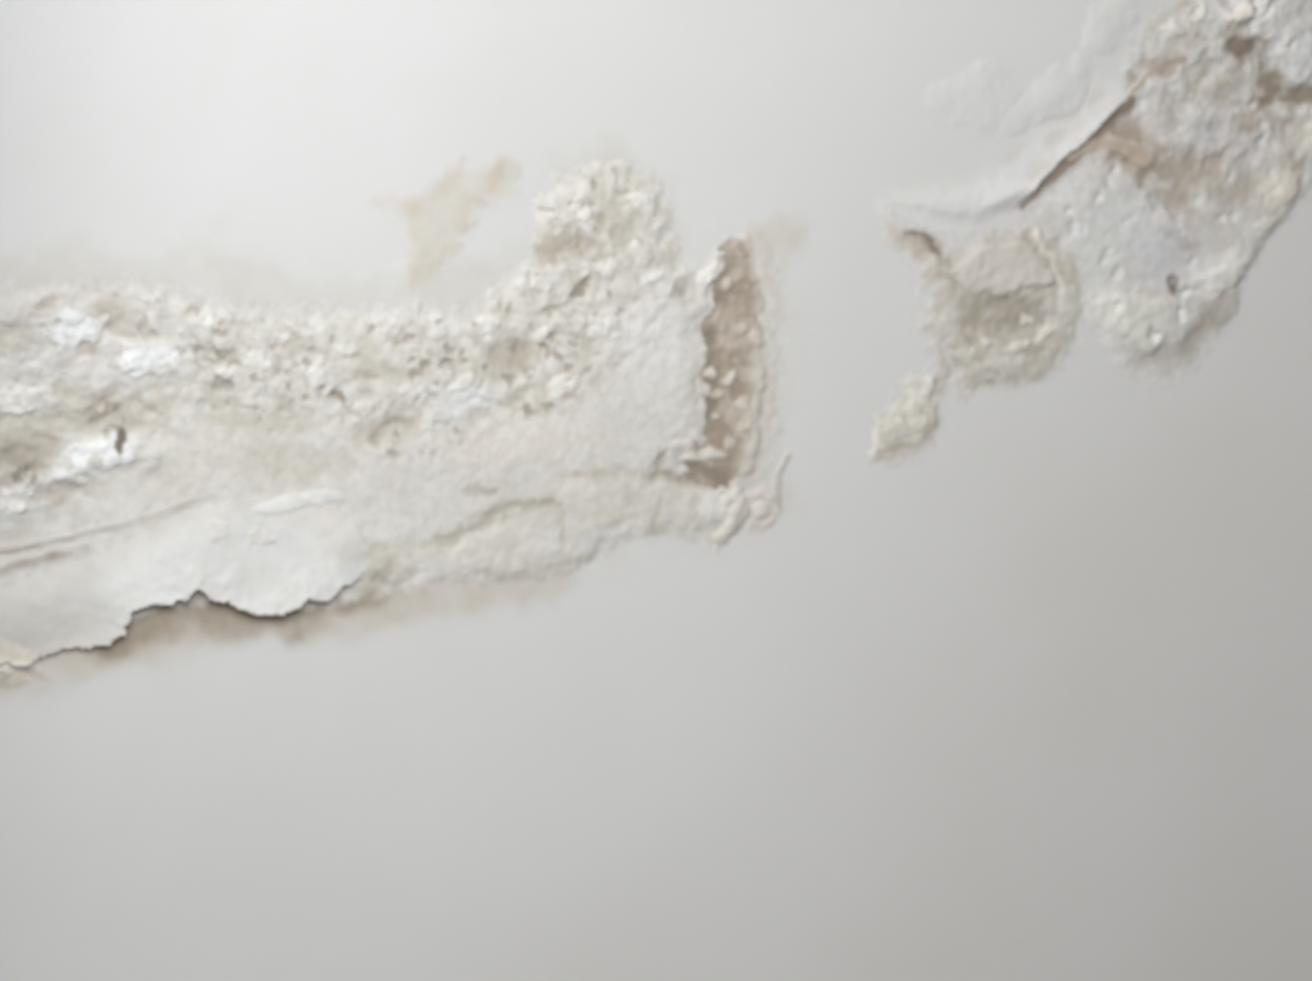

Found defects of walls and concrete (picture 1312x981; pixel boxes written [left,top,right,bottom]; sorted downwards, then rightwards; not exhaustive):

spalling [0,154,792,691]
leakage [0,117,817,714]
spalling [864,0,1312,468]